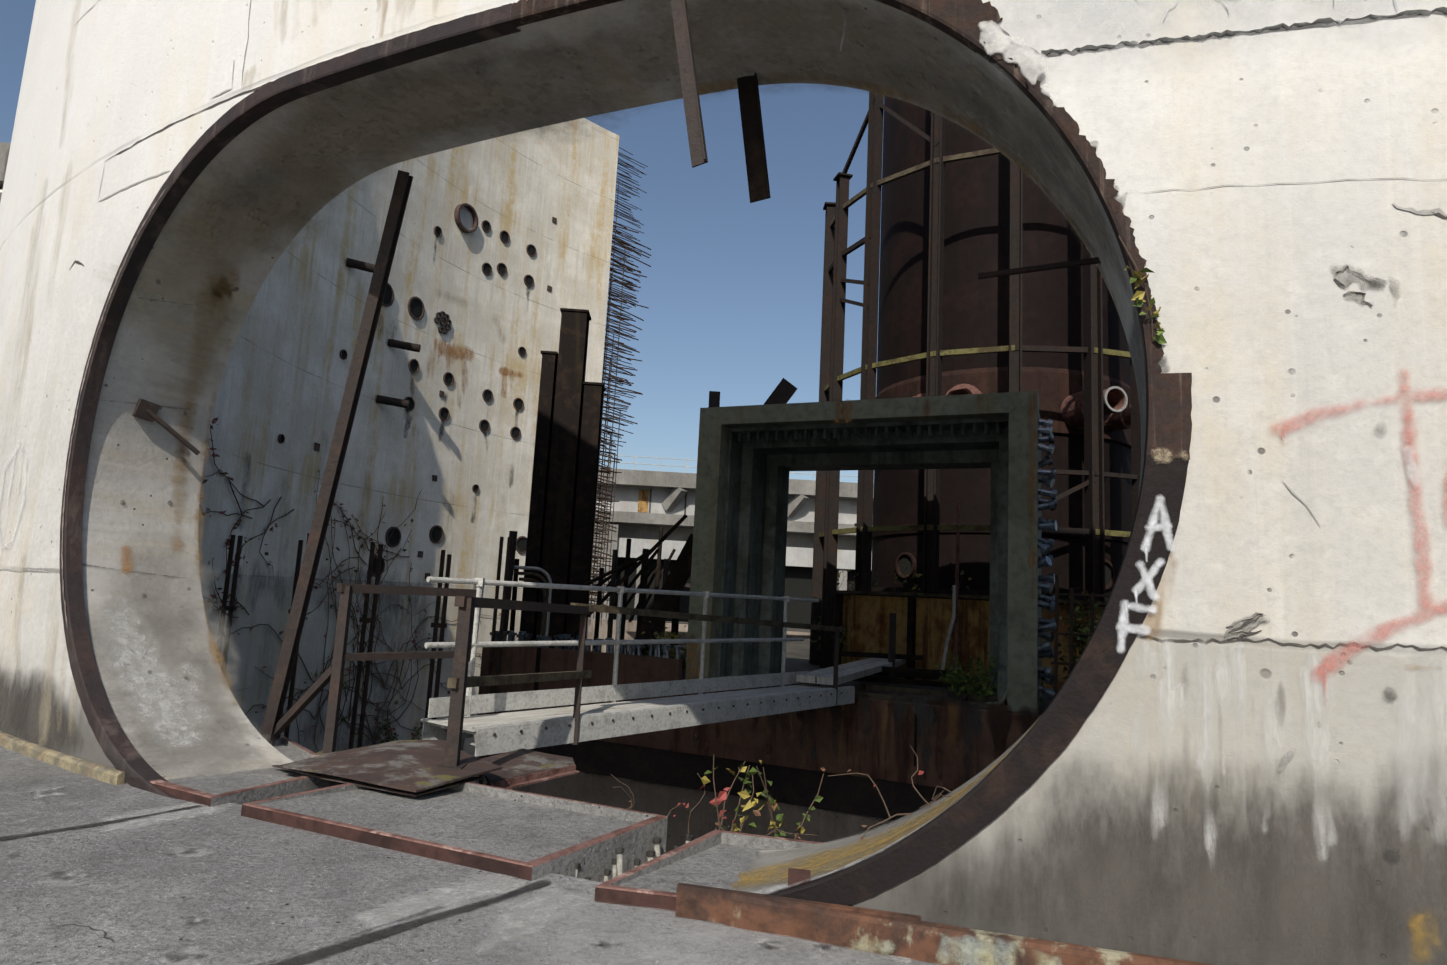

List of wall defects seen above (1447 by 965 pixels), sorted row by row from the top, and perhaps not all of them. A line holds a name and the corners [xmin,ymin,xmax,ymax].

crack [996,0,1447,56]
peeling [979,21,1058,102]
crack [1142,178,1447,219]
spalling [1333,265,1400,307]
crack [1140,630,1447,651]
leakage [0,676,75,749]
rust [988,702,1039,756]